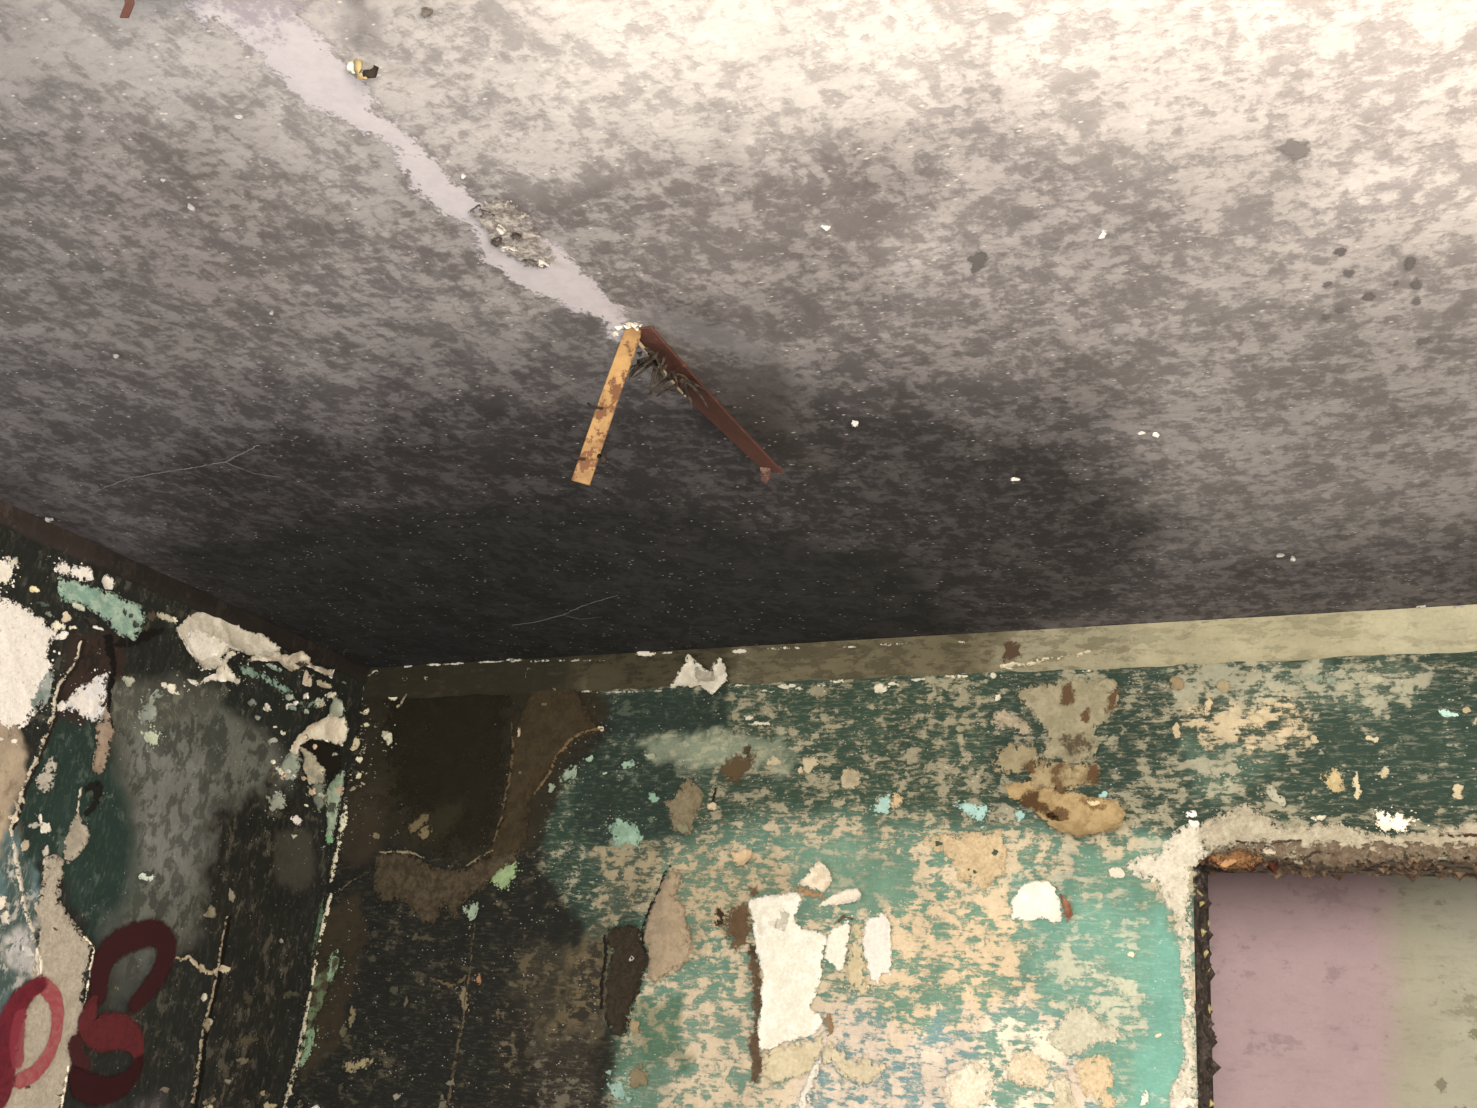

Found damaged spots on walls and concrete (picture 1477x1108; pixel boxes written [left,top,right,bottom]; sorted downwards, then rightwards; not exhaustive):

spalling [468,197,556,269]
flaking render [988,667,1033,736]
peeling [1438,707,1477,726]
flaking render [0,556,747,1108]
damp [406,800,463,847]
peeling [869,792,904,819]
flaking render [922,800,1026,890]
flaking render [1317,767,1362,800]
peeling [1010,881,1073,923]
spalling [1108,784,1477,1108]
peeling [748,861,899,1108]
flaking render [942,1003,1124,1108]